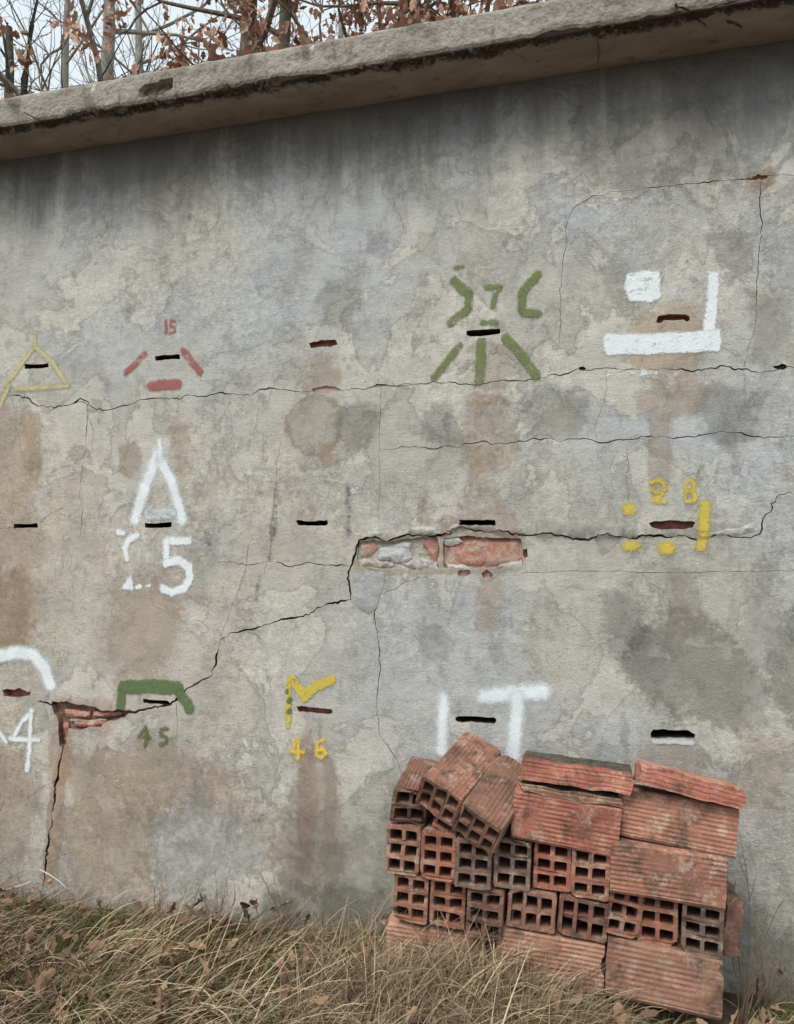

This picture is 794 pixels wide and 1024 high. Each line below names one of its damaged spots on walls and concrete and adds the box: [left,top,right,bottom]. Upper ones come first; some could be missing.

crack [0,387,309,538]
crack [130,174,794,774]
spalling [353,535,528,614]
spalling [51,701,131,747]
crack [20,745,66,891]